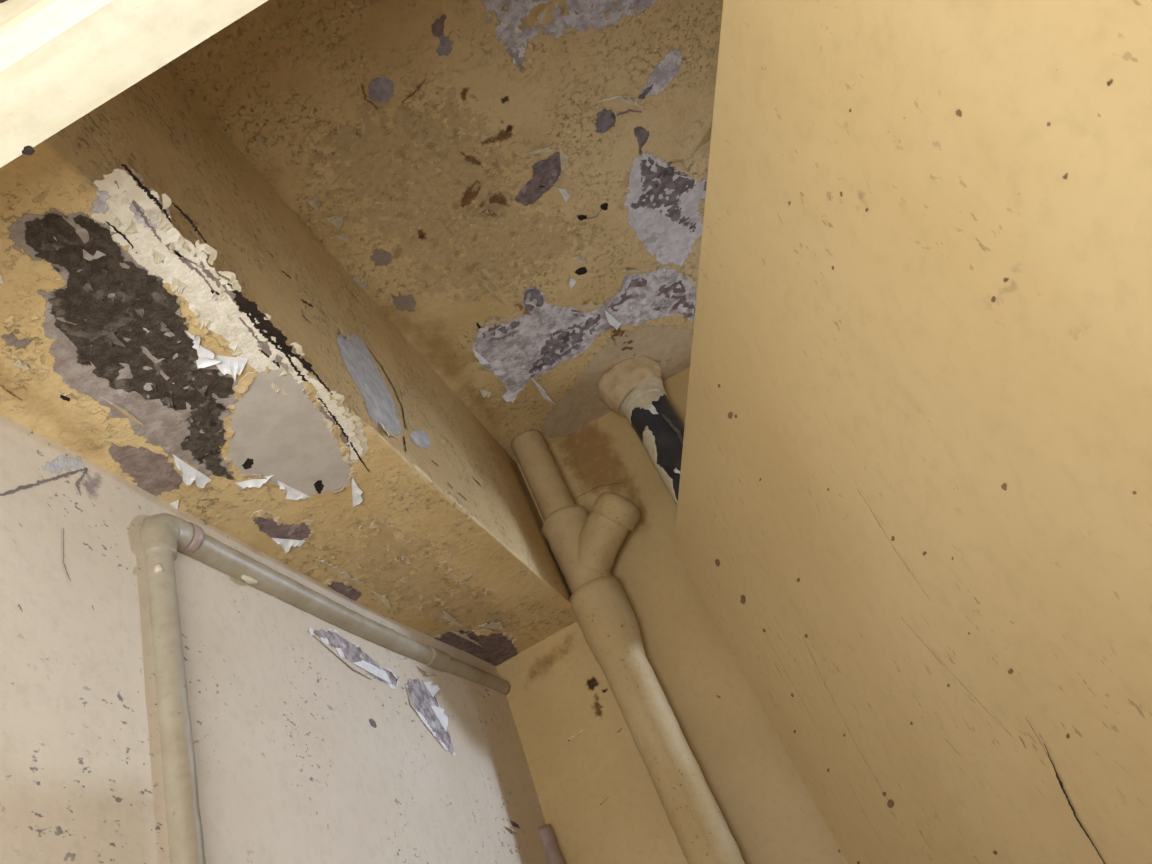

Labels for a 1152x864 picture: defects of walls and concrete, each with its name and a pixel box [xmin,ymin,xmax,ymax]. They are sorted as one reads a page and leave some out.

peeling [480,0,659,72]
peeling [576,49,682,134]
spalling [467,127,708,405]
peeling [1,333,31,371]
spalling [7,164,439,508]
crack [227,283,370,472]
peeling [307,626,455,756]
spalling [435,611,518,666]
crack [1020,719,1105,864]